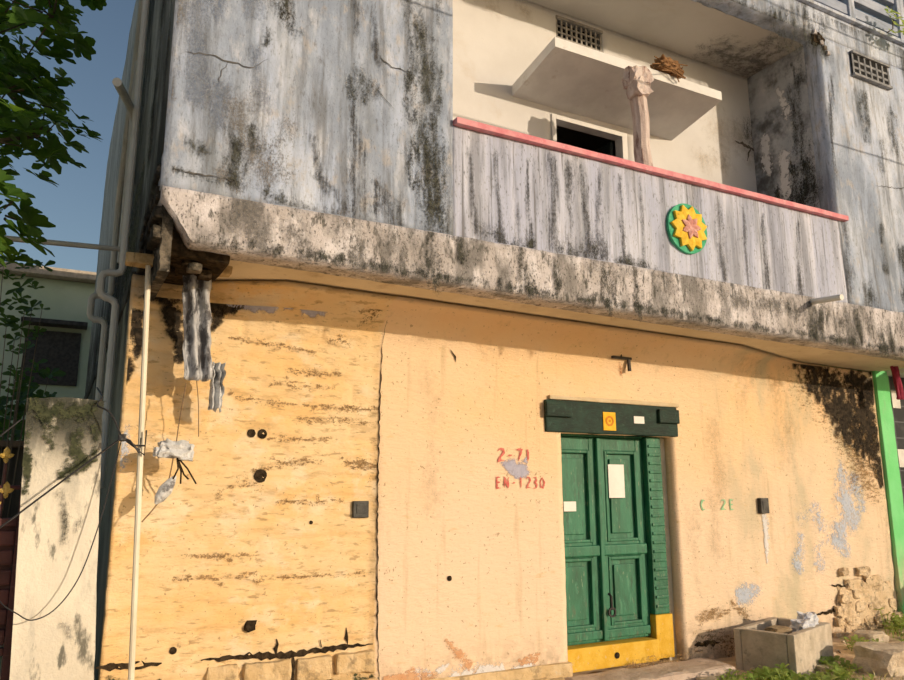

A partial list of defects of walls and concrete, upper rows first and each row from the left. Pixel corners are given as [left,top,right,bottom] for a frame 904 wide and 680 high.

crack [190,52,265,83]
leakage [547,157,656,319]
leakage [126,309,144,384]
leakage [141,295,184,364]
peeling [227,304,325,317]
leakage [42,420,101,482]
crack [201,322,387,680]
peeling [501,458,529,480]
peeling [807,464,865,569]
leakage [791,364,884,502]
crack [96,660,162,671]
spalling [383,639,540,680]